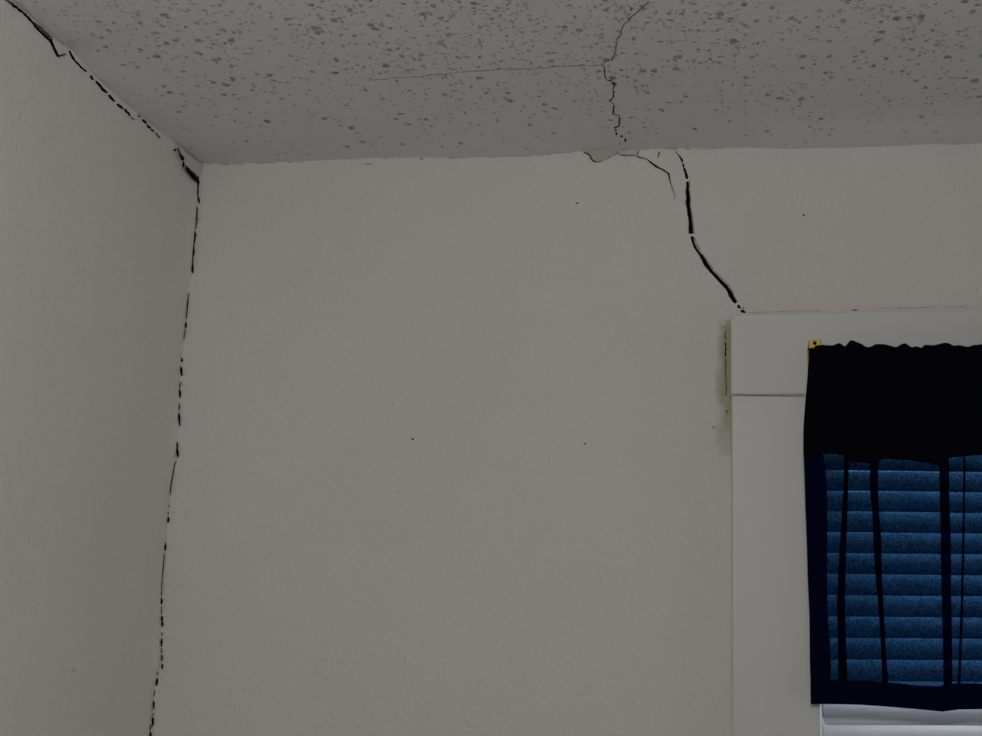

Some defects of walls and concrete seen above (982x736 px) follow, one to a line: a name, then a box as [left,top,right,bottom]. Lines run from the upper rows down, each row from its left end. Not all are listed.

crack [382,3,789,313]
crack [5,0,300,736]
crack [724,332,801,412]